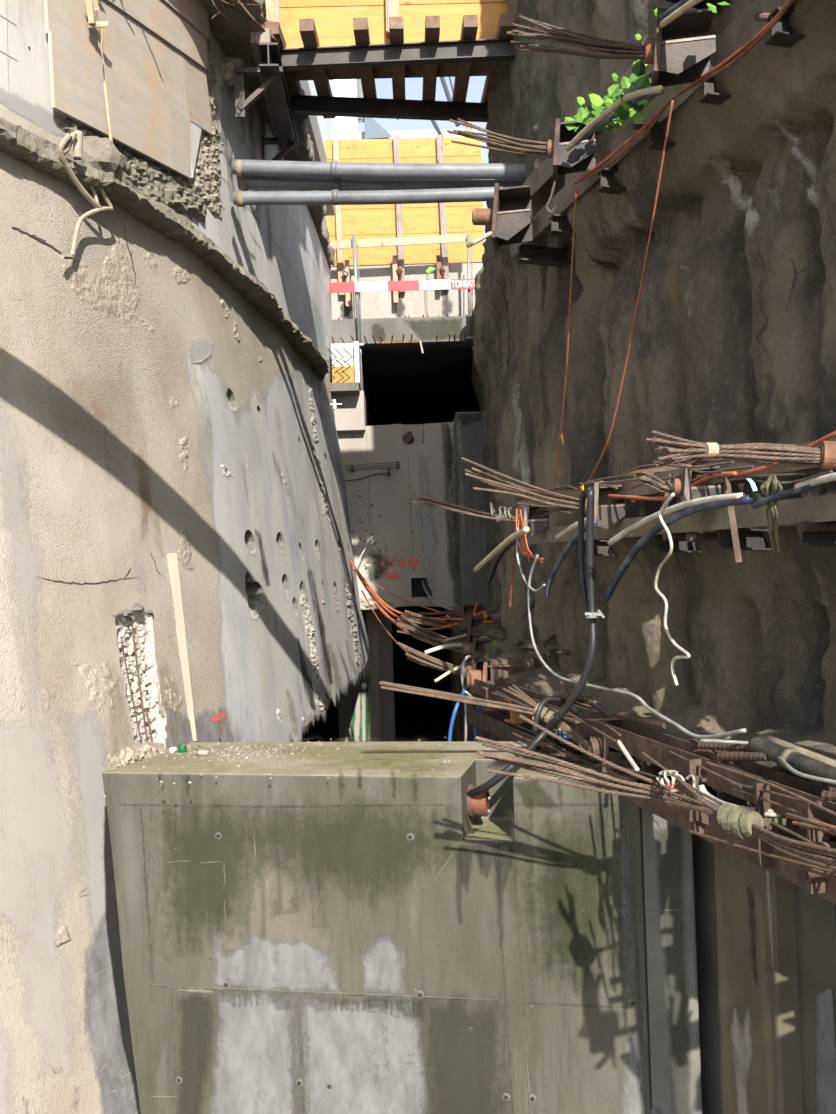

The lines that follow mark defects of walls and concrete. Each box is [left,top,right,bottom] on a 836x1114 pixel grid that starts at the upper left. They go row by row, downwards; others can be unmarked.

spalling [0,87,98,137]
spalling [115,0,265,222]
spalling [12,227,157,332]
spalling [171,266,191,285]
crack [38,552,159,585]
flaking render [106,338,396,768]
water stain [257,532,269,585]
water stain [297,639,315,709]
water stain [309,570,332,684]
water stain [457,843,512,940]
water stain [541,824,606,975]
water stain [169,805,496,1114]